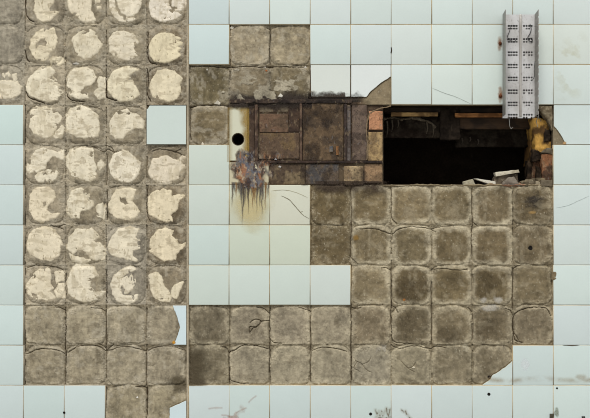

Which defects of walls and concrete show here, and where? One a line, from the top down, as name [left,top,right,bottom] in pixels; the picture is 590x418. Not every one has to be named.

spalling [0,0,391,418]
crack [221,307,276,384]
corrosion [231,150,281,212]
spalling [189,105,590,385]